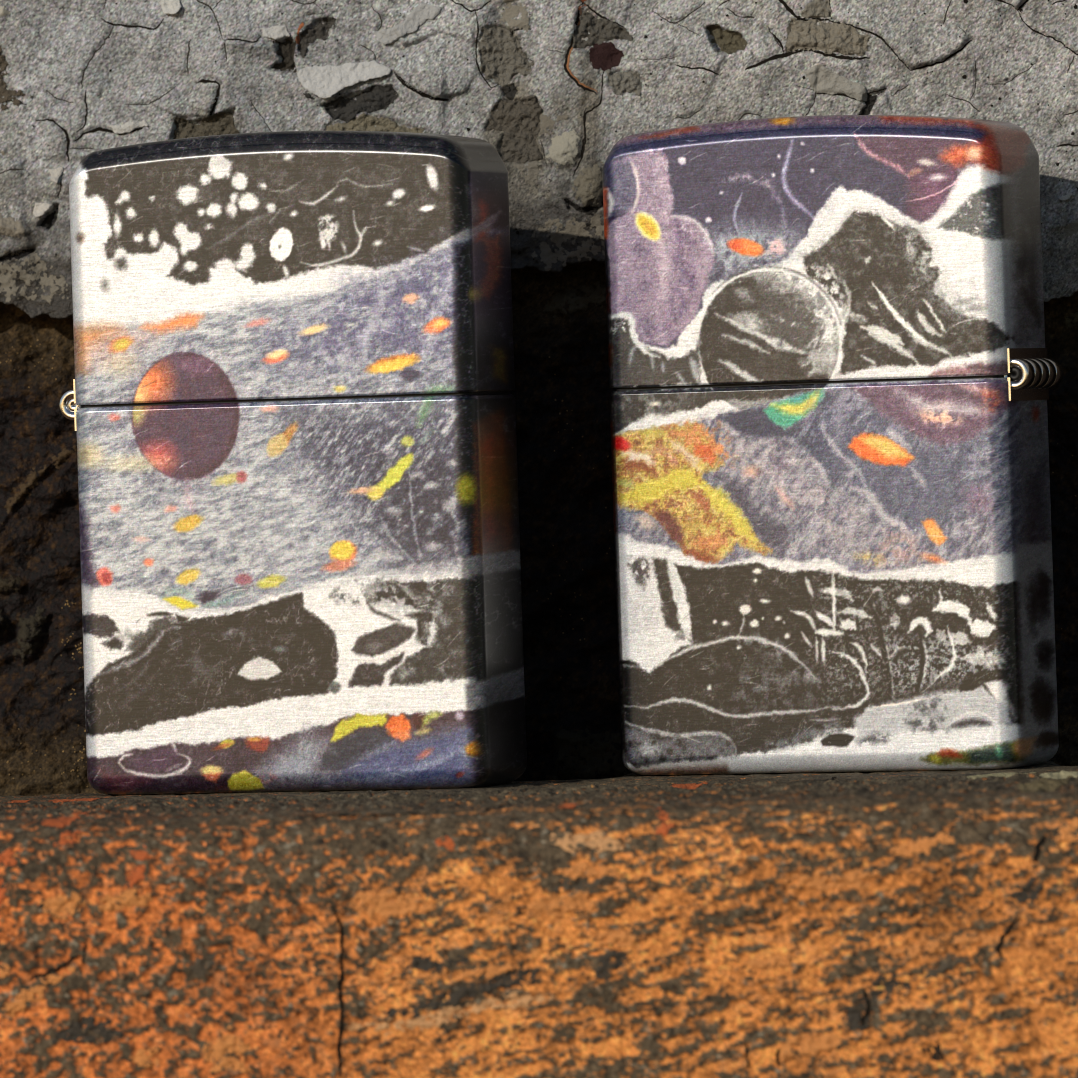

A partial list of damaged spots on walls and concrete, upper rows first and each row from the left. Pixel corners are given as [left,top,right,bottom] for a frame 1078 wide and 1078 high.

peeling [0,45,33,111]
crack [21,0,261,199]
peeling [261,25,424,133]
crack [360,7,449,101]
crack [451,0,498,88]
peeling [478,27,545,164]
crack [511,2,624,176]
peeling [572,11,633,49]
peeling [606,69,642,96]
crack [652,0,1036,116]
crack [997,0,1078,73]
spalling [564,198,603,215]